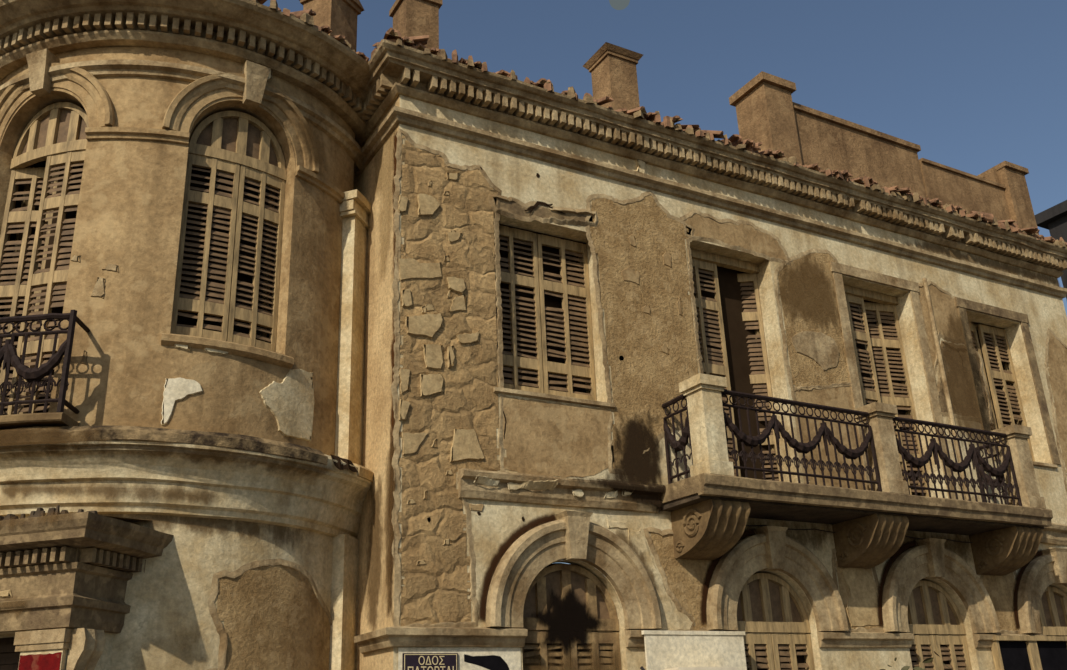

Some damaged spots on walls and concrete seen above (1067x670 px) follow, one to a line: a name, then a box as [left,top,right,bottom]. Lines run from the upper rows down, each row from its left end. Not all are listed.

leakage [780,258,838,327]
flaking render [391,128,867,630]
leakage [0,428,329,475]
leakage [2,481,211,503]
flaking render [207,558,332,670]